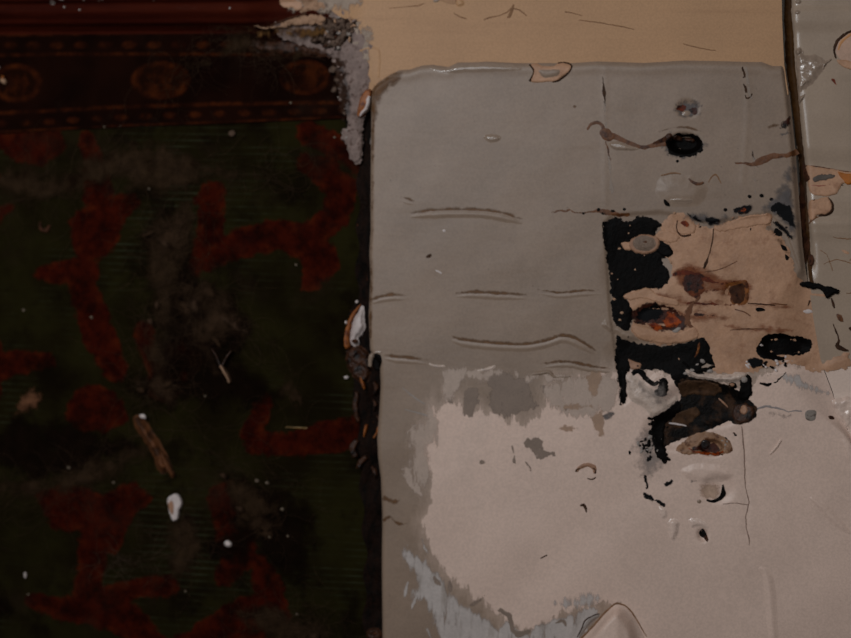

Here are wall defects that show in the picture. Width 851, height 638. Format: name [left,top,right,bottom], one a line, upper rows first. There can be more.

peeling [529,62,572,83]
peeling [833,30,851,70]
crack [587,77,666,160]
peeling [805,165,851,224]
corrosion [631,267,749,333]
peeling [601,212,851,374]
peeling [448,372,539,419]
peeling [511,438,555,471]
peeling [575,463,597,480]